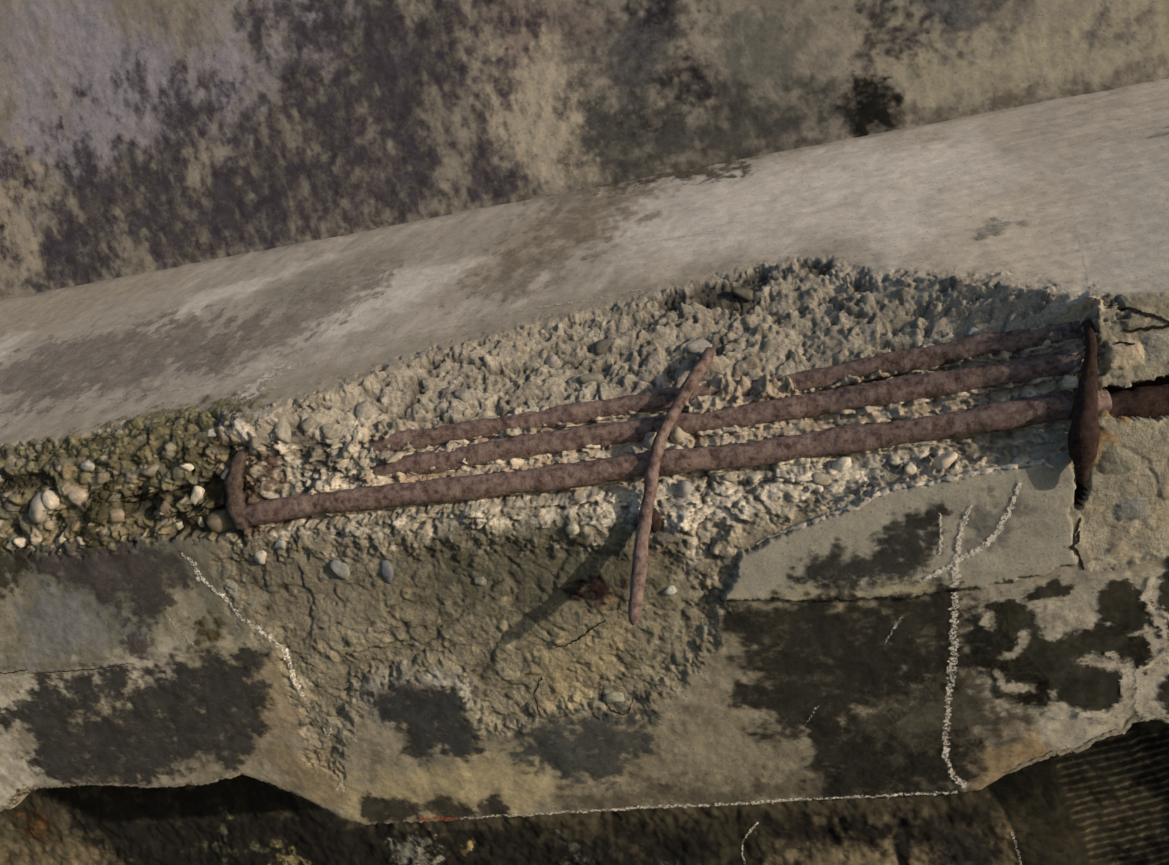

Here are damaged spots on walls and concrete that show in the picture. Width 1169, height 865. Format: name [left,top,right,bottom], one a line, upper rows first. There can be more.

water stain [0,0,1007,301]
water stain [977,217,1025,240]
rust [219,448,285,549]
spalling [0,249,1169,792]
rust [651,508,662,534]
rust [564,575,628,615]
water stain [0,533,275,789]
water stain [357,661,486,767]
water stain [508,700,661,791]
spalling [0,772,360,823]